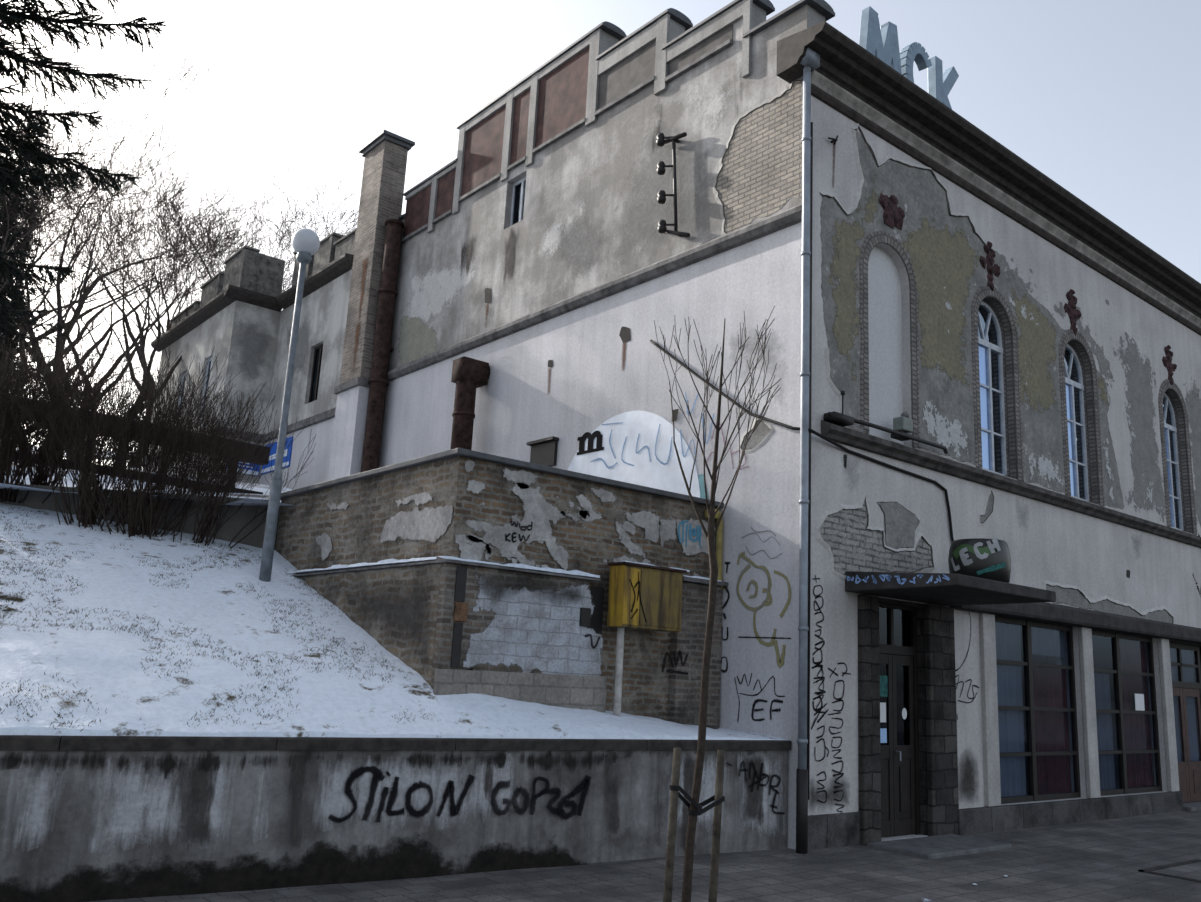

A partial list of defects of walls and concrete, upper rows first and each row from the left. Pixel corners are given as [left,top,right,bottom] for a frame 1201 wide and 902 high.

leakage [619,125,708,258]
flaking render [712,76,803,235]
leakage [406,239,476,323]
flaking render [820,123,1166,522]
flaking render [464,459,485,506]
peeling [380,468,716,676]
flaking render [815,492,935,581]
flaking render [1043,580,1174,624]
leakage [91,763,227,851]
leakage [317,755,513,828]
leakage [657,756,723,850]
leakage [738,756,782,832]